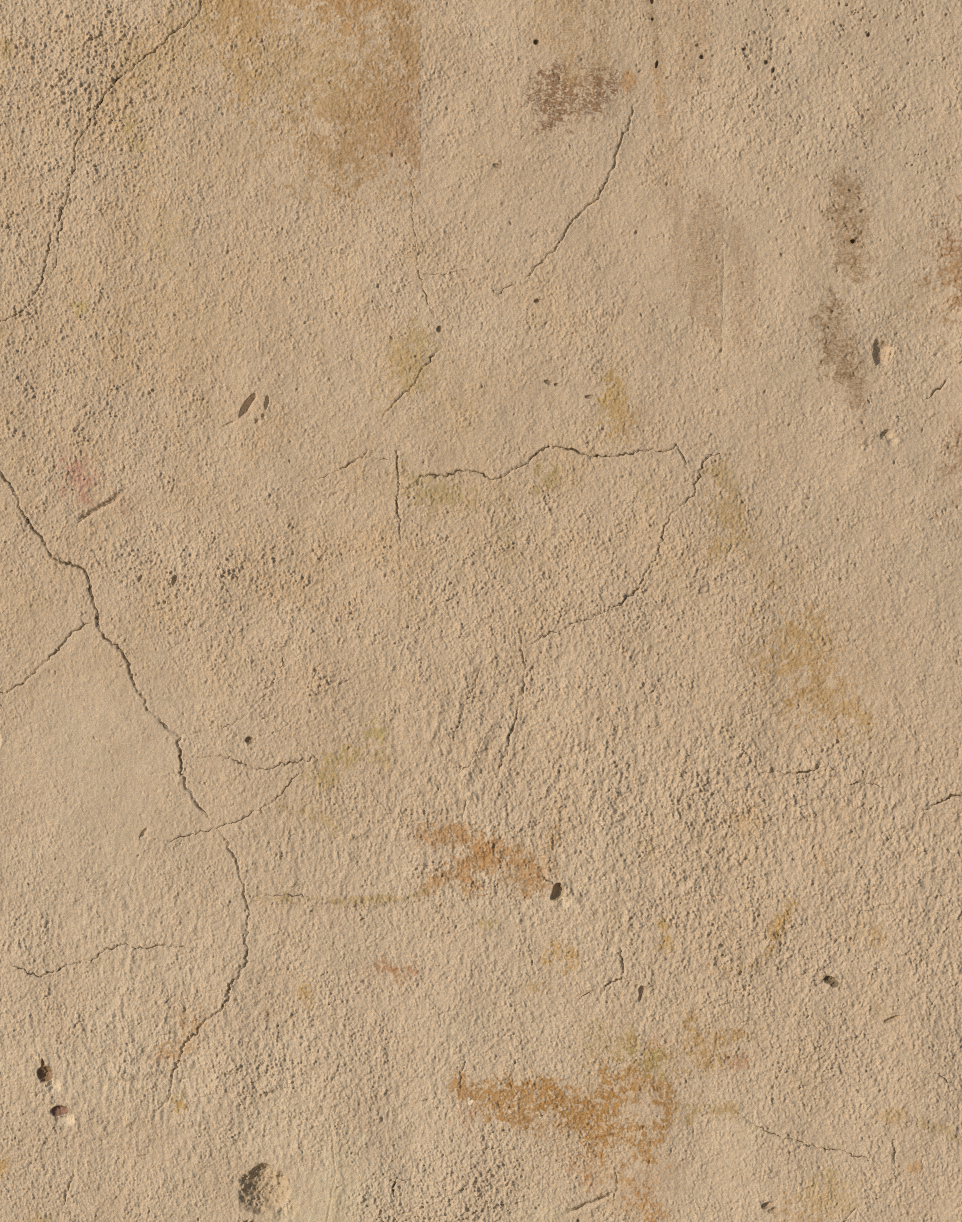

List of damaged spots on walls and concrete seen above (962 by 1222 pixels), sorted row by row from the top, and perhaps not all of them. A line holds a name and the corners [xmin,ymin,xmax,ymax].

crack [0,0,202,322]
water stain [38,0,439,419]
crack [496,102,638,297]
water stain [511,0,765,363]
water stain [795,56,898,456]
crack [0,471,318,1111]
corrosion [251,816,569,934]
crack [301,444,719,814]
corrosion [436,890,806,1222]